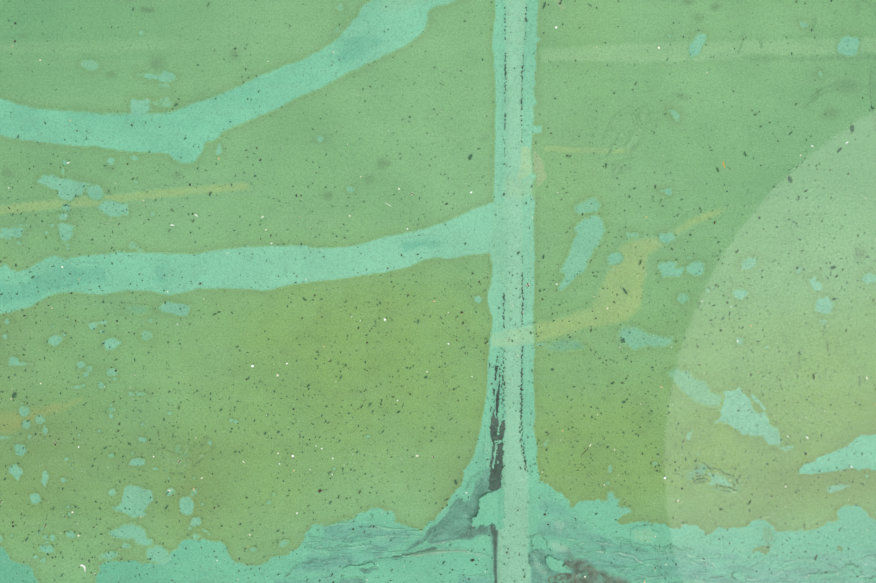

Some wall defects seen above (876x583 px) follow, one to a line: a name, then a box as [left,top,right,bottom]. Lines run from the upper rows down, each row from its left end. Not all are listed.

peeling [523,1,543,147]
peeling [0,0,507,583]
peeling [523,198,537,325]
spalling [556,195,625,292]
spalling [615,324,675,354]
peeling [522,337,876,583]